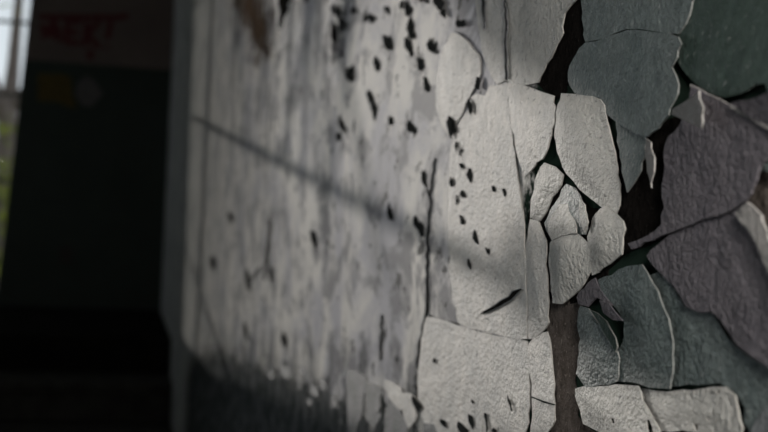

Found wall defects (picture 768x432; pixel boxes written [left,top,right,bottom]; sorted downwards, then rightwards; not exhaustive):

spalling [330,4,378,43]
spalling [382,0,446,93]
spalling [342,64,356,83]
spalling [366,90,394,125]
spalling [336,115,347,142]
spalling [446,116,473,183]
spalling [413,215,424,237]
peeling [507,0,768,432]
peeling [268,366,305,379]
peeling [307,379,338,408]
peeling [346,370,497,432]